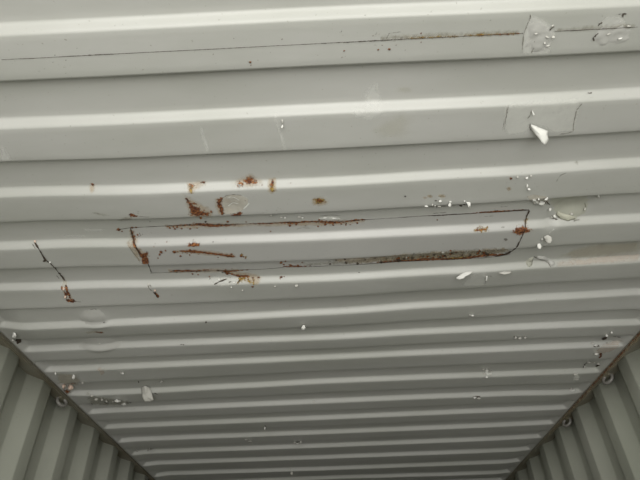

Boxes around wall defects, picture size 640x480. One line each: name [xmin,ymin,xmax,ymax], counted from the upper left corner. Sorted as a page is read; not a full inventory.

peeling [522,15,555,52]
peeling [592,13,631,46]
peeling [528,111,549,146]
corrosion [186,184,241,219]
corrosion [173,242,246,259]
crack [117,209,530,298]
crack [32,240,77,303]
peeling [138,381,156,402]